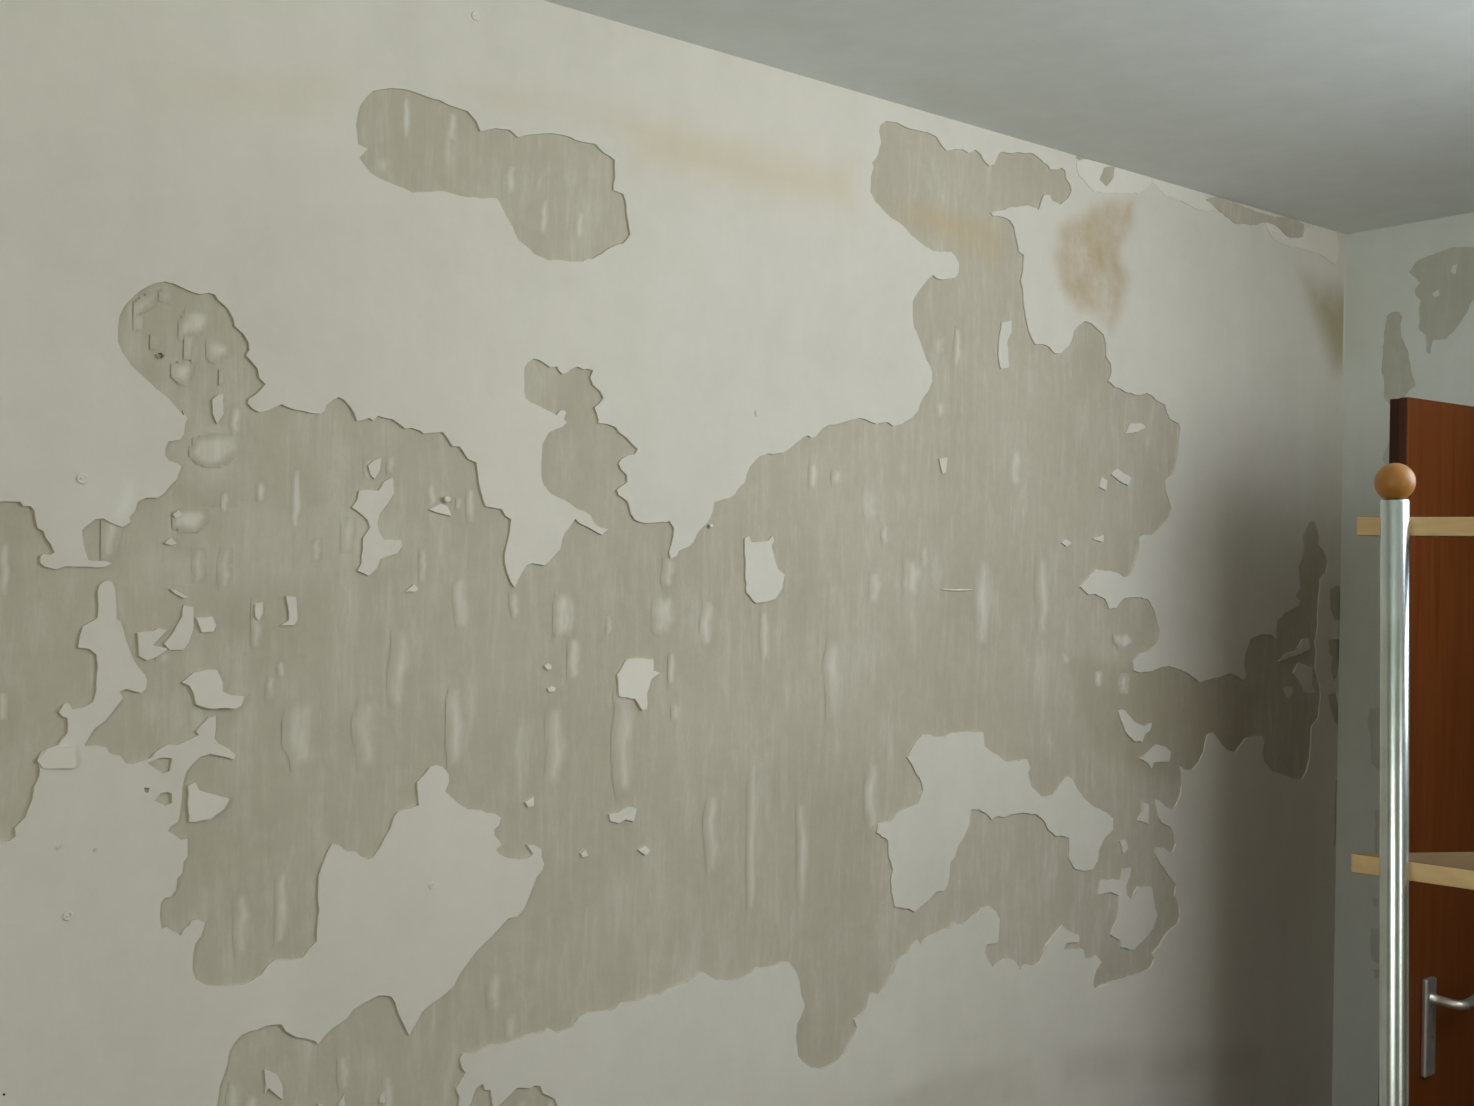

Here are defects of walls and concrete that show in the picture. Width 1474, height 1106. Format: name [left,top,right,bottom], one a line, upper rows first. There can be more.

peeling [356,89,629,262]
peeling [870,122,1070,210]
leakage [1045,190,1140,344]
peeling [1076,159,1339,265]
peeling [1381,247,1474,405]
peeling [0,187,1327,1106]
peeling [1328,639,1339,680]
peeling [1330,586,1340,620]